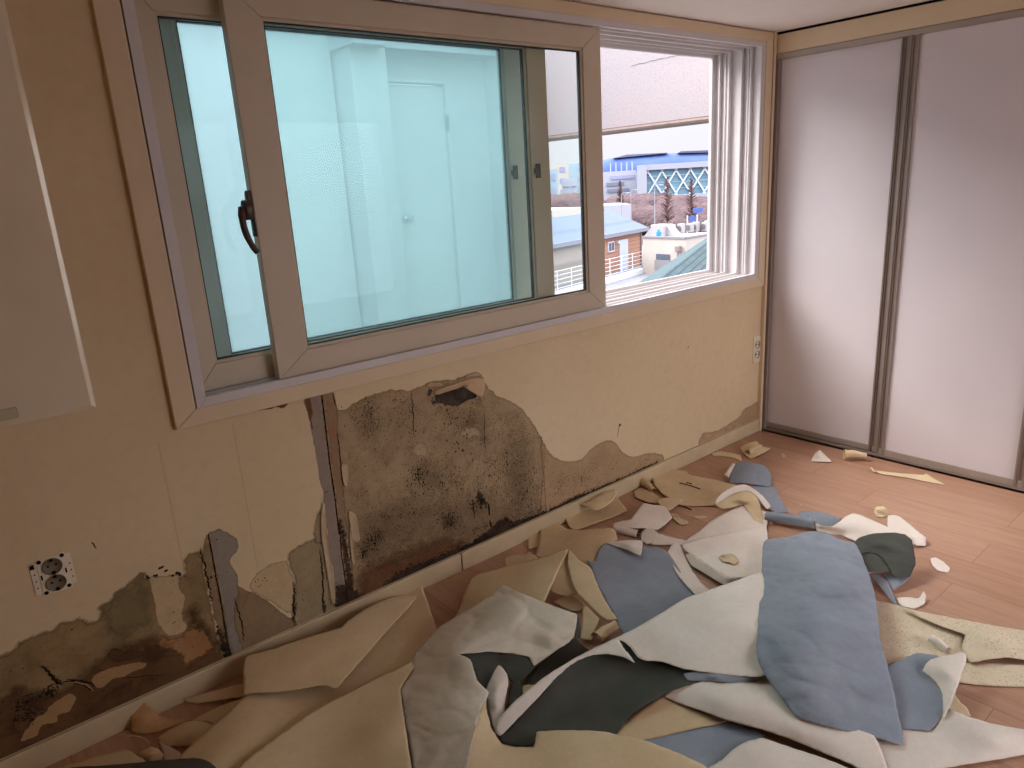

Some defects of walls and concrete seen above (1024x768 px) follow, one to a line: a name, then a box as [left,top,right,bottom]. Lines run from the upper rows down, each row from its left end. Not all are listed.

peeling [159,529,243,664]
peeling [304,392,355,608]
water stain [0,375,664,759]
spalling [427,378,485,406]